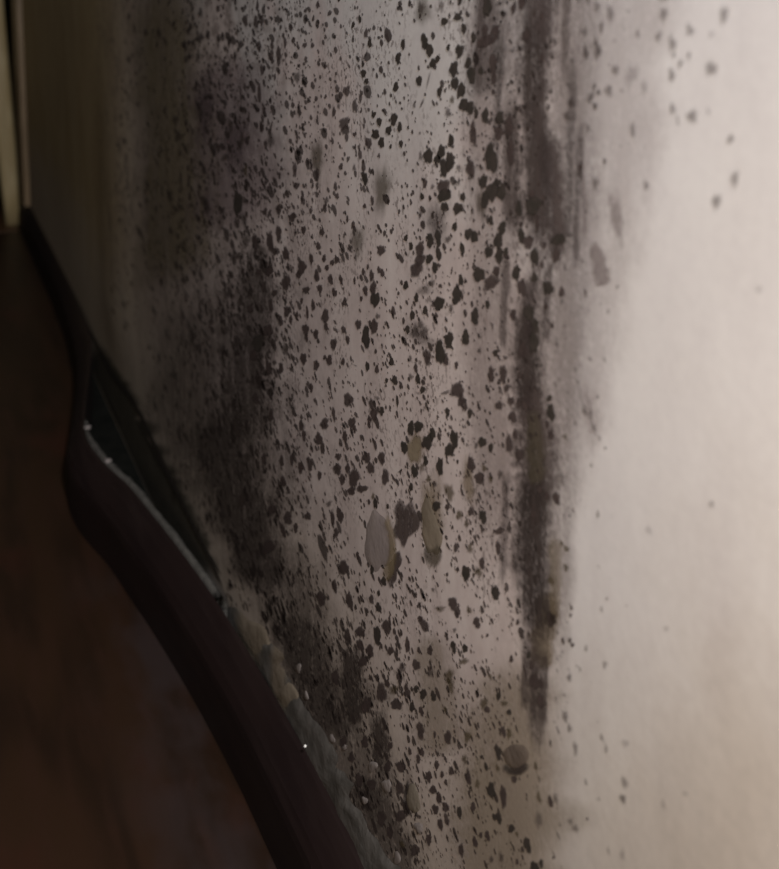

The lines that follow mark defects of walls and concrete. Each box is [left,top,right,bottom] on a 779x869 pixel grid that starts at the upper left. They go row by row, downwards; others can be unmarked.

water stain [91,0,574,869]
peeling [389,501,420,587]